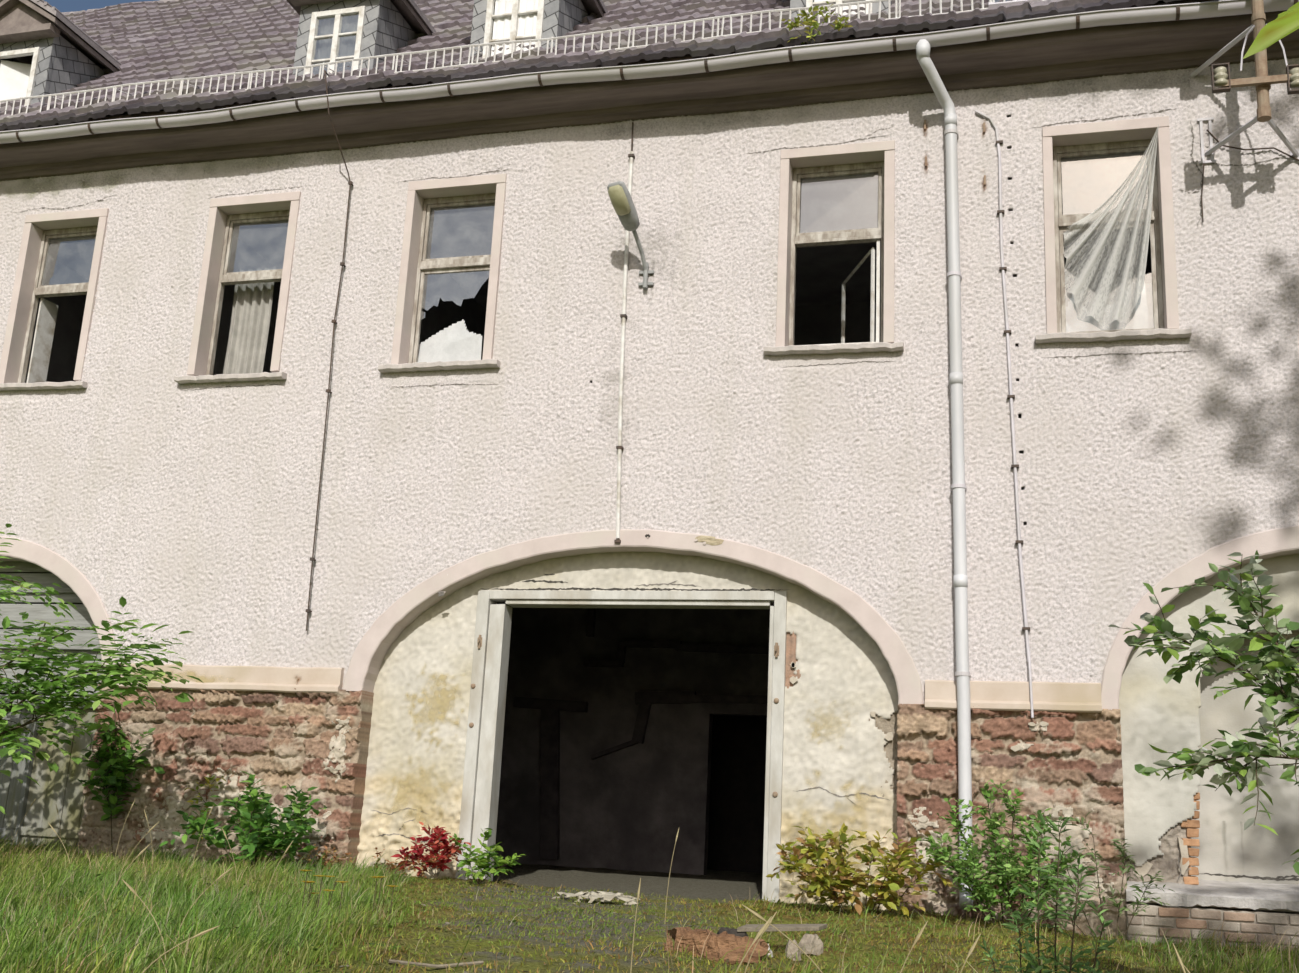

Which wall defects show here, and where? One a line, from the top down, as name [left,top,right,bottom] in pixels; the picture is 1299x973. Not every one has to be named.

crack [1033,108,1284,228]
peeling [134,768,335,857]
peeling [323,717,351,783]
crack [799,787,888,809]
flaking render [869,711,898,801]
peeling [906,807,946,887]